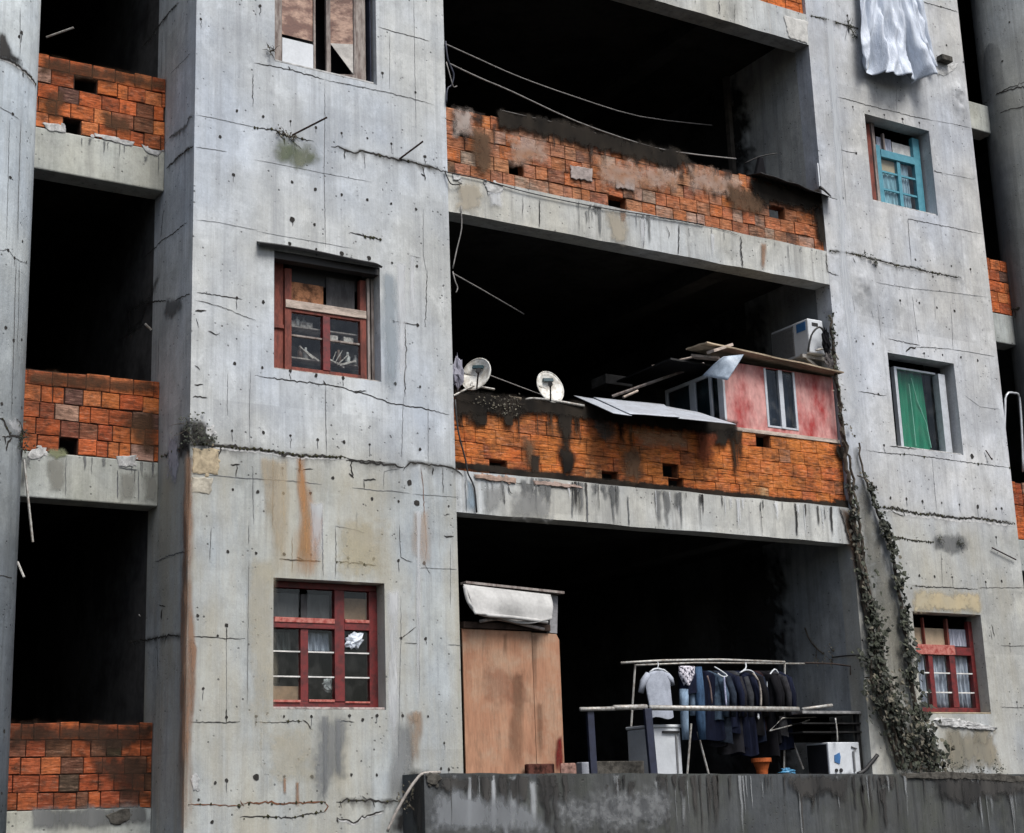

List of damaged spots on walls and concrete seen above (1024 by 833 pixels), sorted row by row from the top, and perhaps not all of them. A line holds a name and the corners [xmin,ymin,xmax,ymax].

crack [254,126,446,179]
water stain [454,109,496,146]
spalling [570,165,593,182]
water stain [569,140,742,198]
crack [826,219,985,352]
spalling [190,425,220,494]
water stain [559,423,643,519]
corrosion [299,461,320,558]
crack [161,443,463,573]
water stain [760,498,849,535]
corrosion [180,457,197,762]
crack [188,797,398,825]